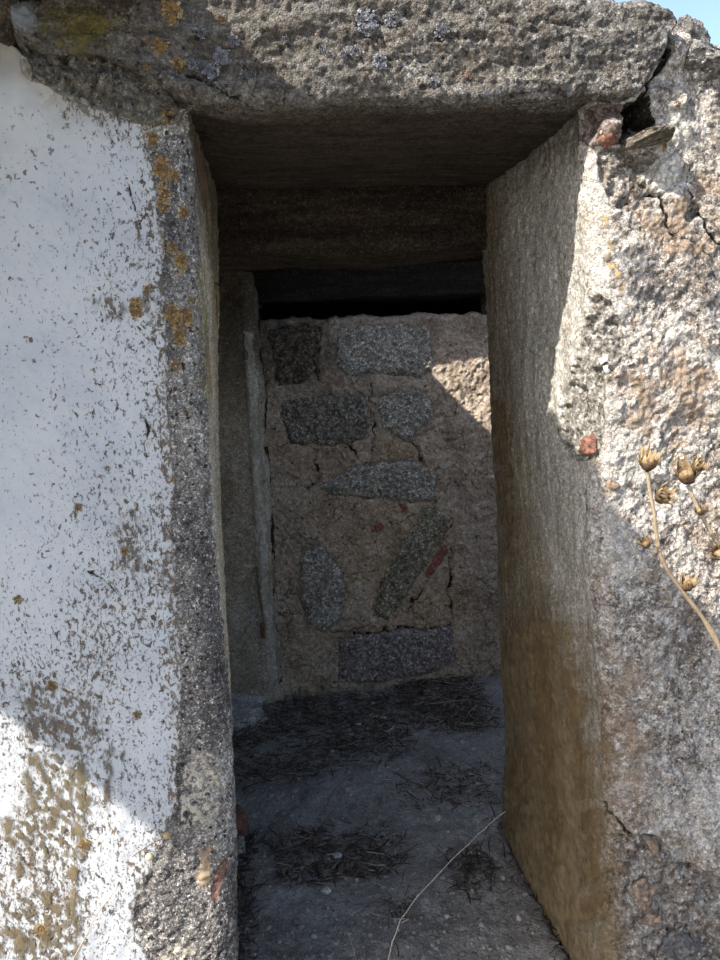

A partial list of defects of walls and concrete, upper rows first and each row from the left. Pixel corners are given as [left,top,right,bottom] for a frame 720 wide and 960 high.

spalling [578,92,684,209]
crack [647,168,720,255]
peeling [13,25,240,960]